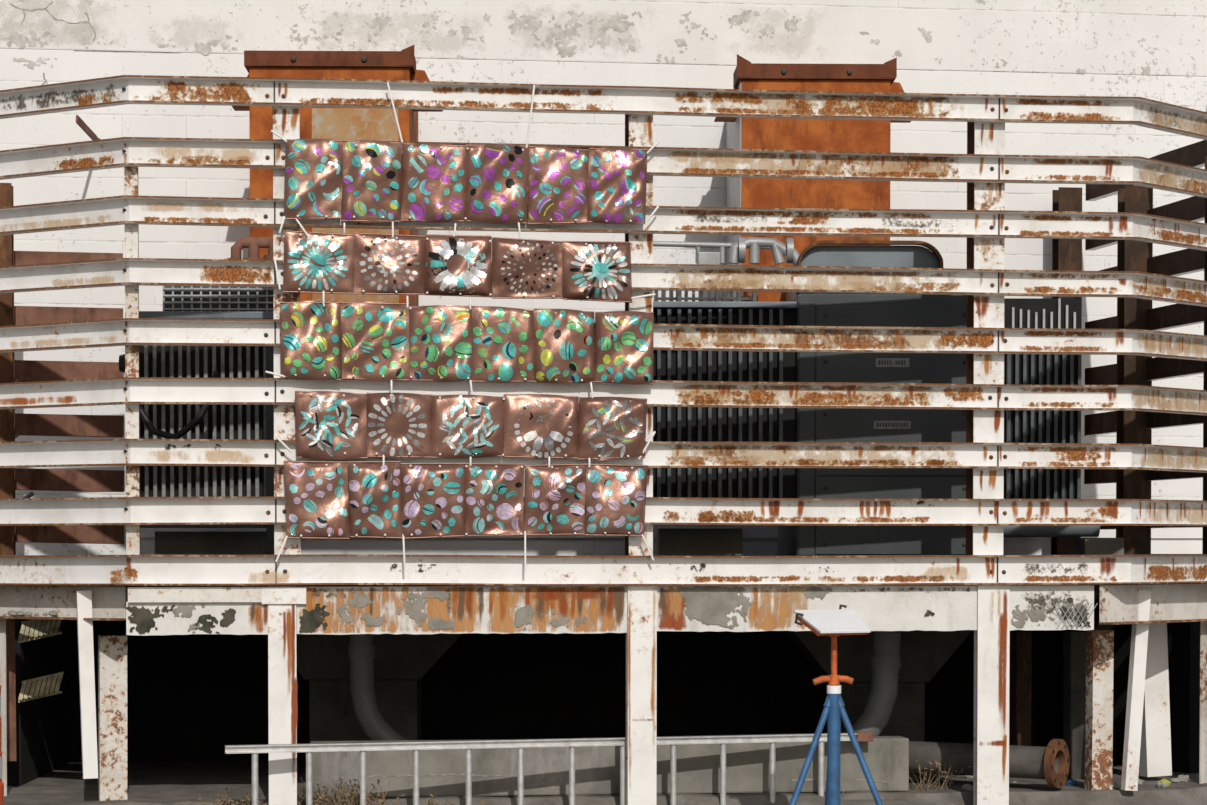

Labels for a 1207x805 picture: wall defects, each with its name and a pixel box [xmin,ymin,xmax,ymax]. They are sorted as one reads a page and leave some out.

crack [9,0,171,53]
corrosion [675,92,956,117]
corrosion [662,296,1004,372]
corrosion [675,384,1001,432]
corrosion [664,501,930,523]
corrosion [979,446,1118,576]
spalling [126,604,236,634]
spalling [299,588,456,633]
spalling [680,586,757,629]
spalling [804,587,833,600]
spalling [1012,597,1091,628]
corrosion [980,593,1007,775]